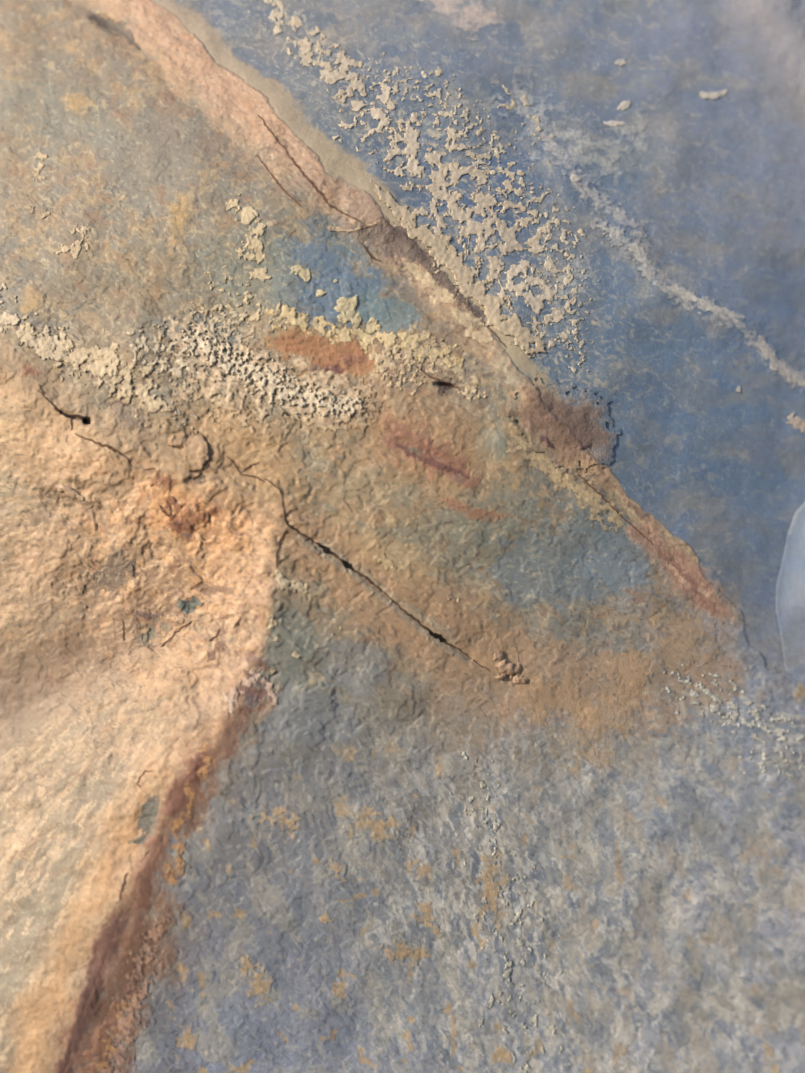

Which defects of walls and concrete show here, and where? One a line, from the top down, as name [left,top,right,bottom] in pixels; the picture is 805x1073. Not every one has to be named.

peeling [33,149,48,182]
peeling [264,0,596,373]
peeling [604,100,632,127]
peeling [699,89,727,100]
peeling [0,193,487,486]
crack [38,384,170,517]
crack [187,456,491,672]
crack [161,618,241,647]
corrosion [39,684,318,1073]